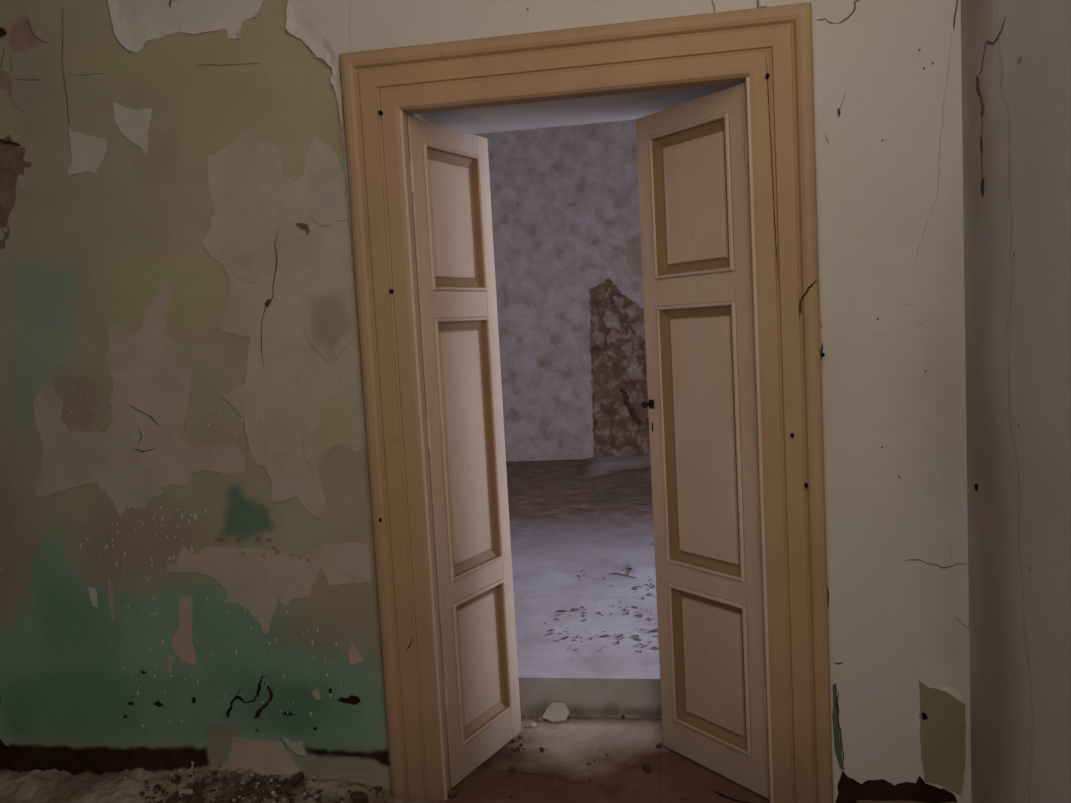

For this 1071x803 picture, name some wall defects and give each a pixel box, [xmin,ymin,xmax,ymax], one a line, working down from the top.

flaking render [0,11,50,55]
crack [816,0,859,24]
flaking render [0,135,32,249]
crack [913,0,958,272]
crack [976,17,1006,197]
flaking render [589,279,650,457]
flaking render [0,739,10,770]
crack [225,674,273,732]
flaking render [328,681,361,705]
peeling [832,680,966,803]